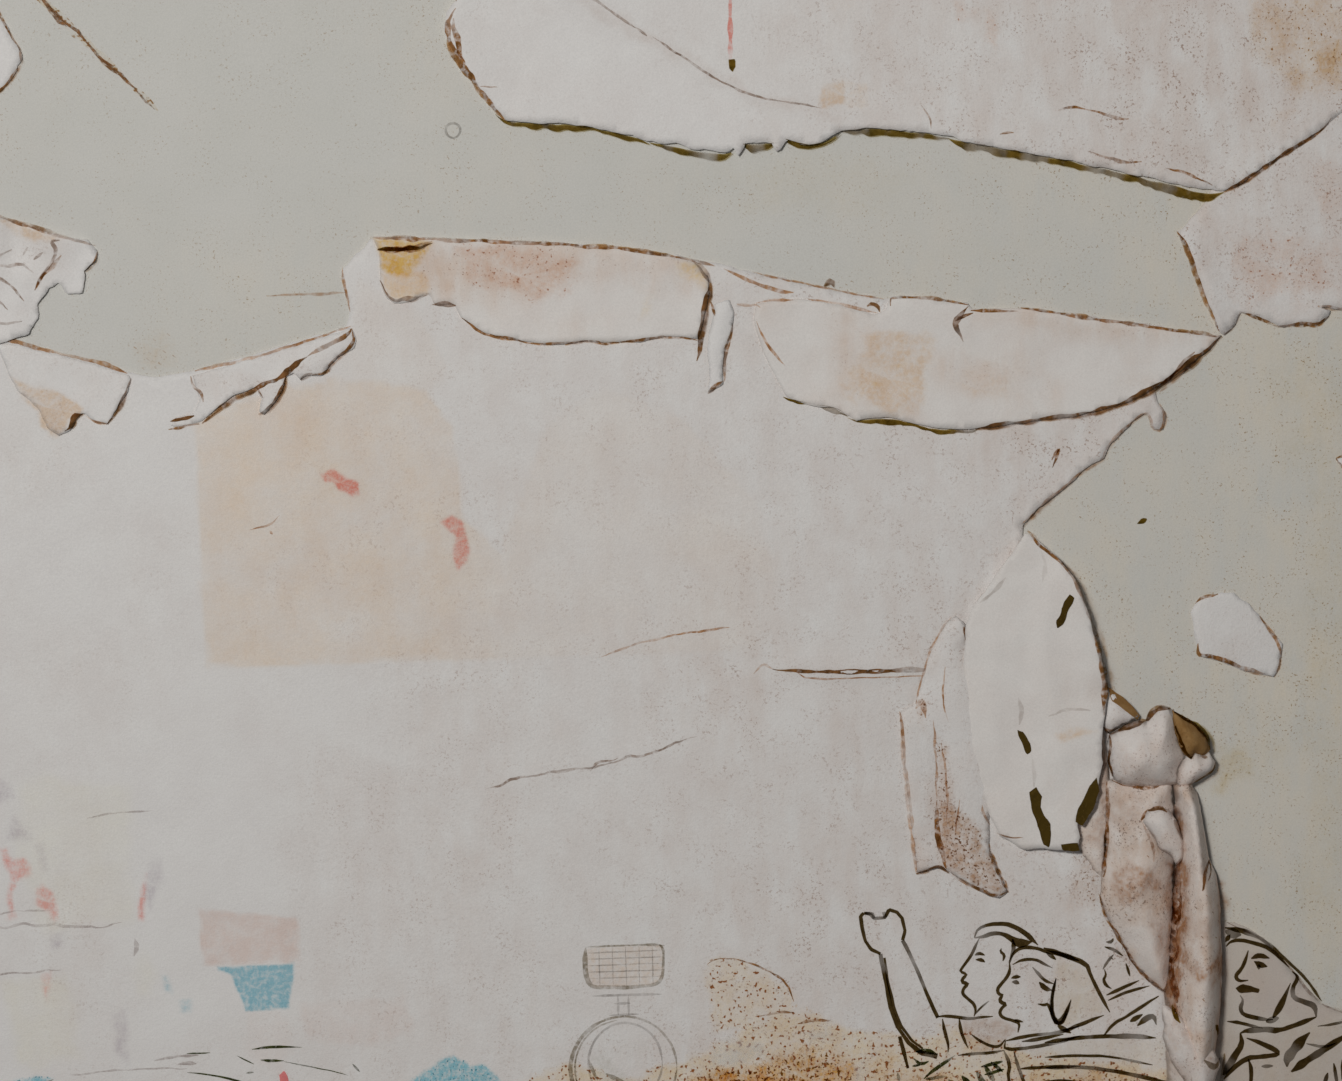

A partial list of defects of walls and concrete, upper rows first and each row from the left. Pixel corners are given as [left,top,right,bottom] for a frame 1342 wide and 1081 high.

crack [37,0,154,109]
peeling [0,217,131,436]
peeling [372,236,734,392]
peeling [754,283,1222,435]
peeling [1191,592,1283,677]